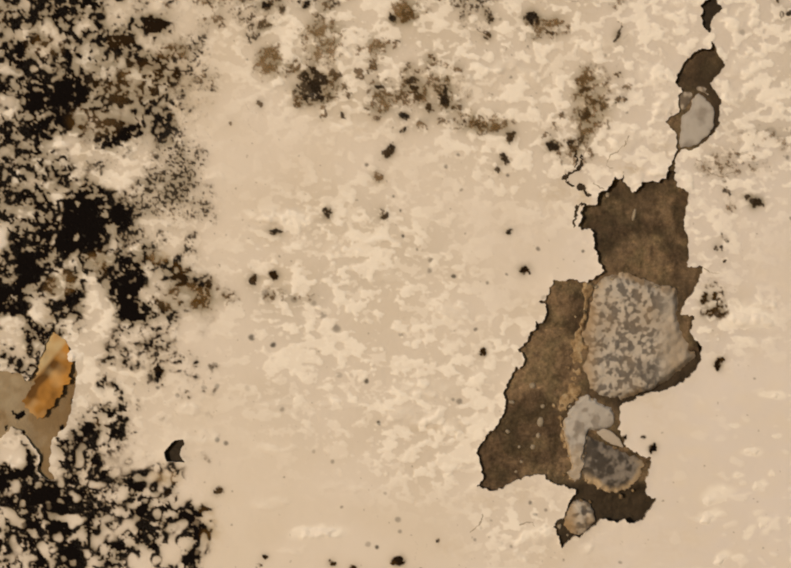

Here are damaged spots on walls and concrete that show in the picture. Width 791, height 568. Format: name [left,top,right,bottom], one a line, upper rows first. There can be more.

mould [239,0,285,44]
mould [388,2,427,23]
mould [454,0,494,40]
mould [523,11,570,36]
mould [286,49,350,118]
mould [354,40,516,142]
mould [543,67,630,163]
mould [0,0,234,386]
peeling [476,0,725,547]
peeling [0,332,77,480]
mould [0,375,213,568]
hole [164,440,185,462]